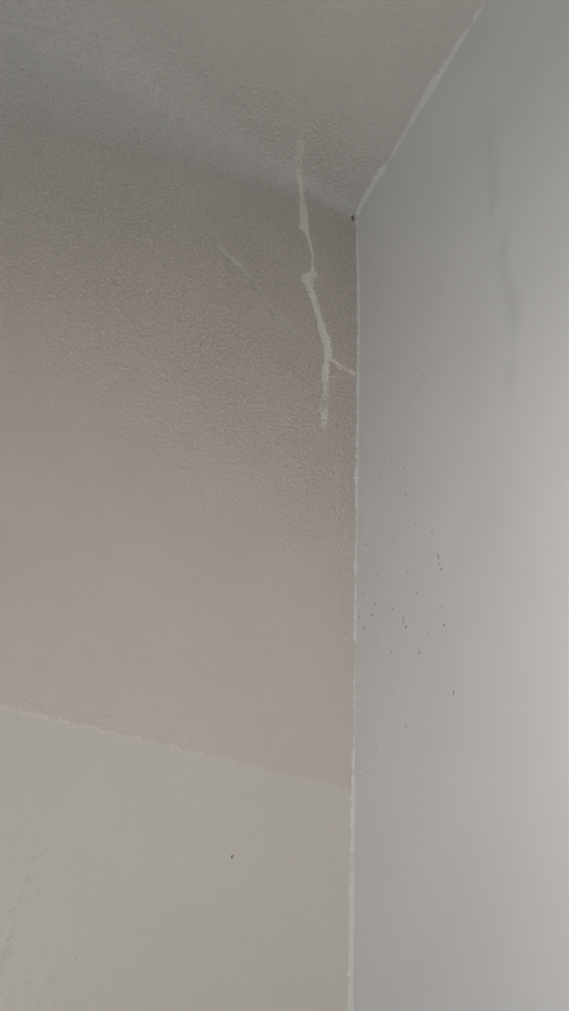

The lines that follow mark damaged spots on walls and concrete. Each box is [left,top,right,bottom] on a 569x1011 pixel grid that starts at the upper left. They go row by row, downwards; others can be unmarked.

crack [294,62,356,440]